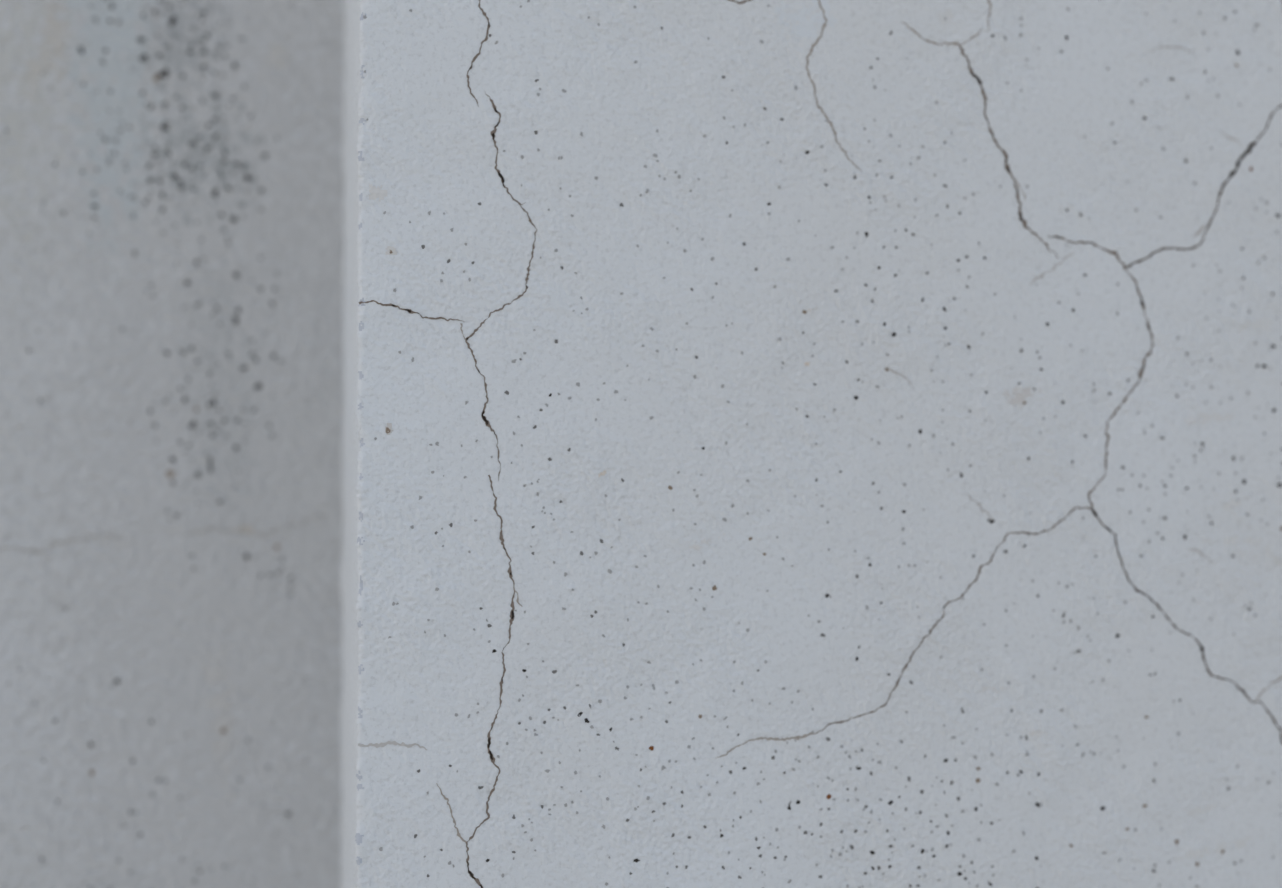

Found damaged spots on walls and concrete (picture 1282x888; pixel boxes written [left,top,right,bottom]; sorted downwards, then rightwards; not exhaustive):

crack [358,0,537,888]
crack [719,0,1282,757]